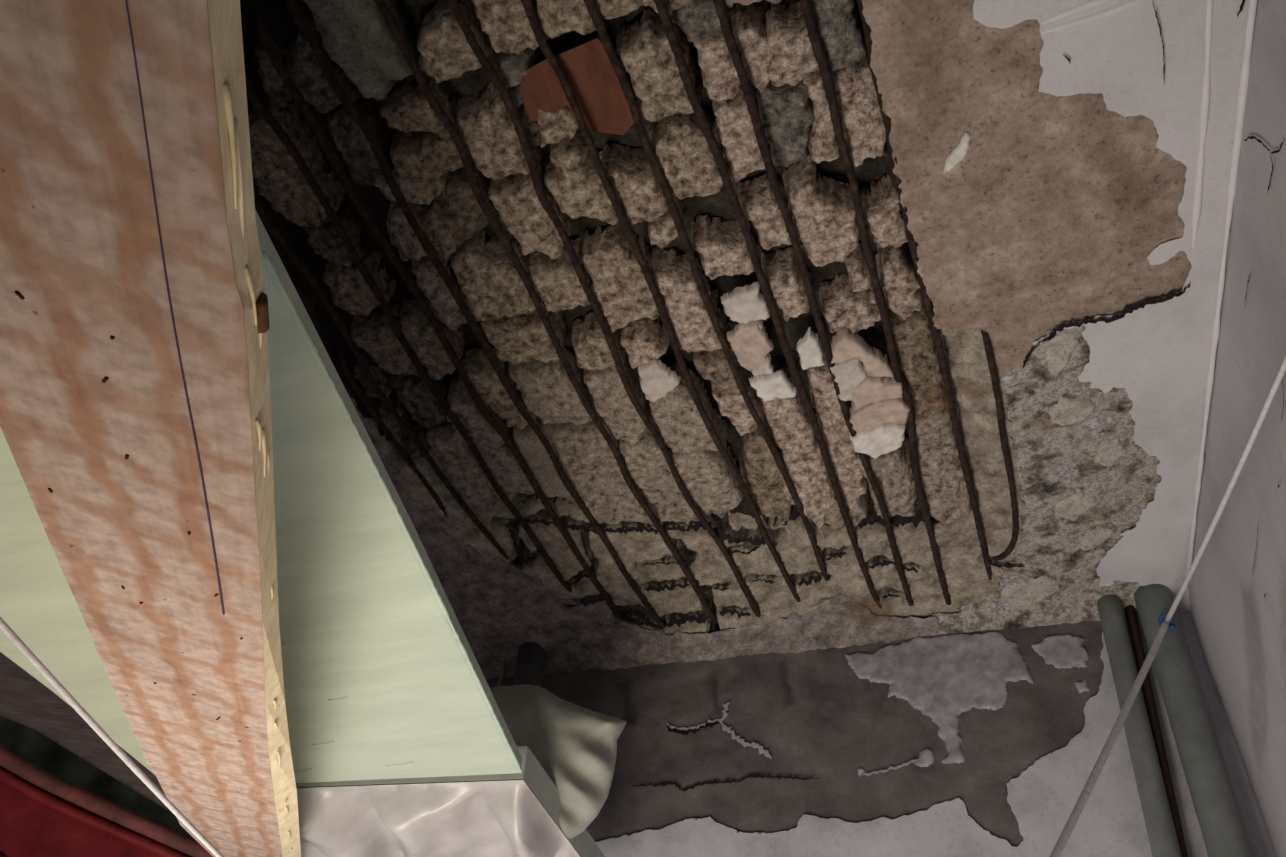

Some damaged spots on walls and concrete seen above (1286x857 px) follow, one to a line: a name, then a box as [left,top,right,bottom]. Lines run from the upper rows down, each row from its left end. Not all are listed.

spalling [240,0,1192,680]
crack [1022,284,1190,368]
crack [632,702,819,791]
water stain [542,620,1104,847]